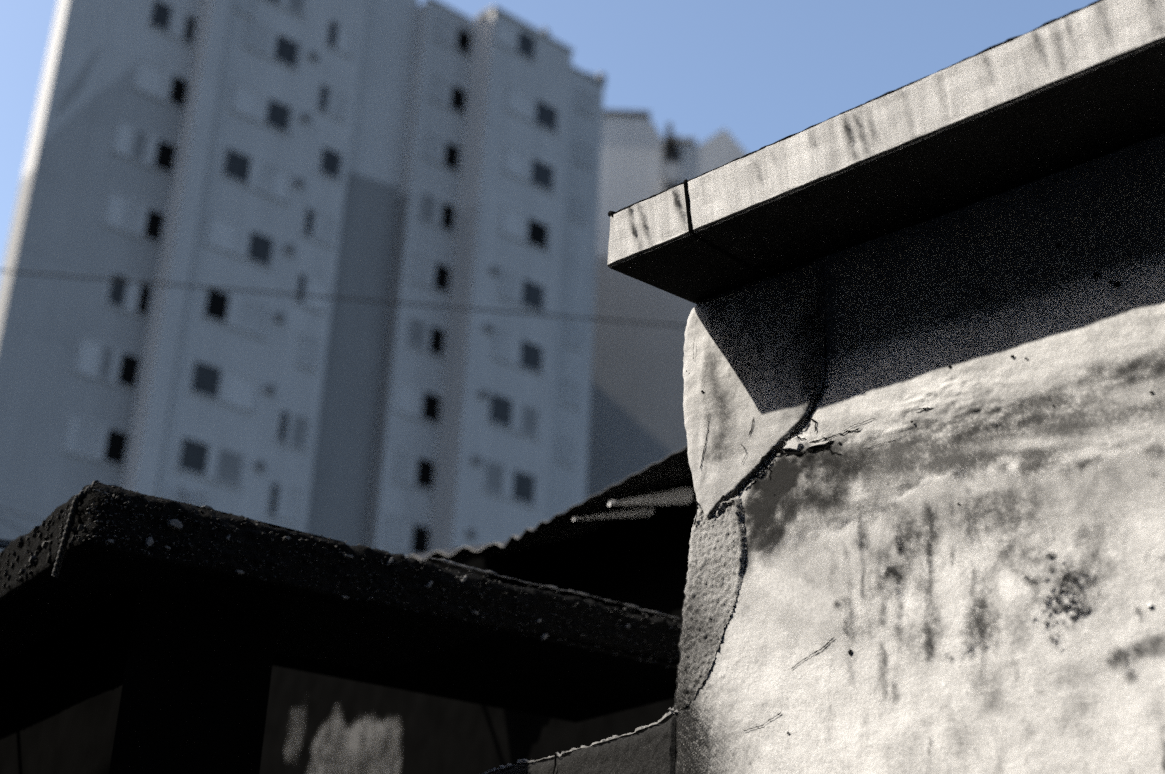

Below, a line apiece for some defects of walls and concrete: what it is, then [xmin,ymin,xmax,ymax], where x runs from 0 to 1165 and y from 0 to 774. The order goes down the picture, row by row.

damp [695,363,726,485]
crack [693,322,900,527]
damp [740,358,1165,643]
damp [966,598,998,651]
damp [1107,635,1165,679]